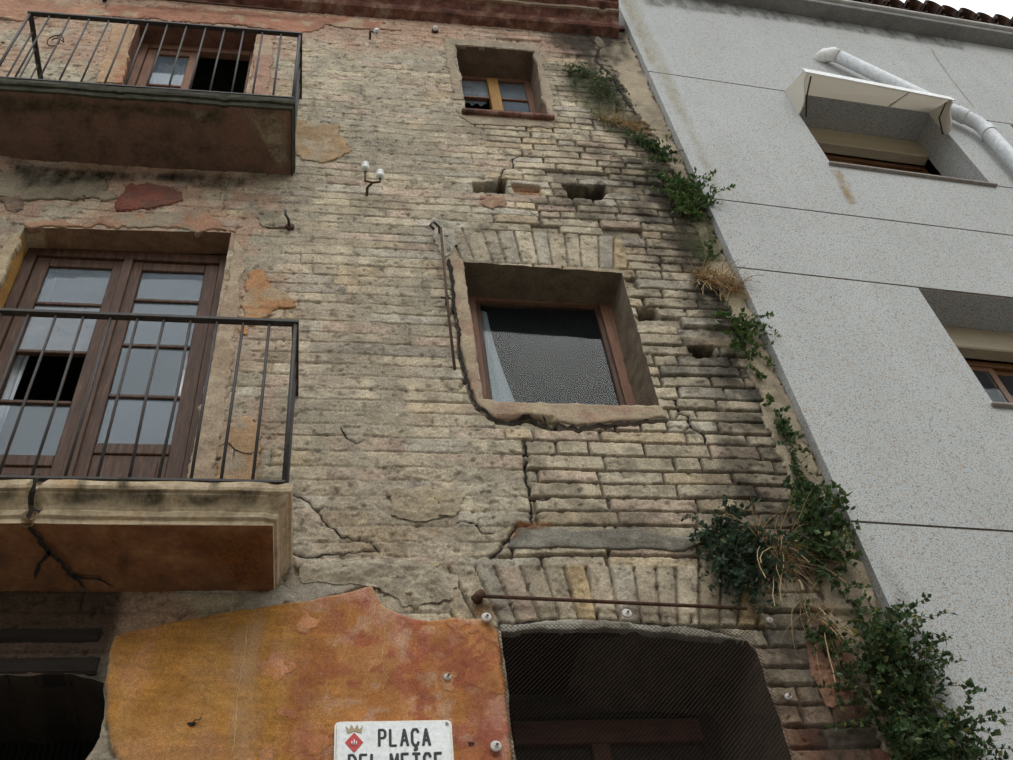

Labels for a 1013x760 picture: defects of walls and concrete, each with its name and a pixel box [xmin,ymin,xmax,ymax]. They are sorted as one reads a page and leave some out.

flaking render [296,119,352,163]
flaking render [0,170,296,479]
crack [26,477,114,588]
crack [293,495,379,559]
flaking render [105,558,513,760]